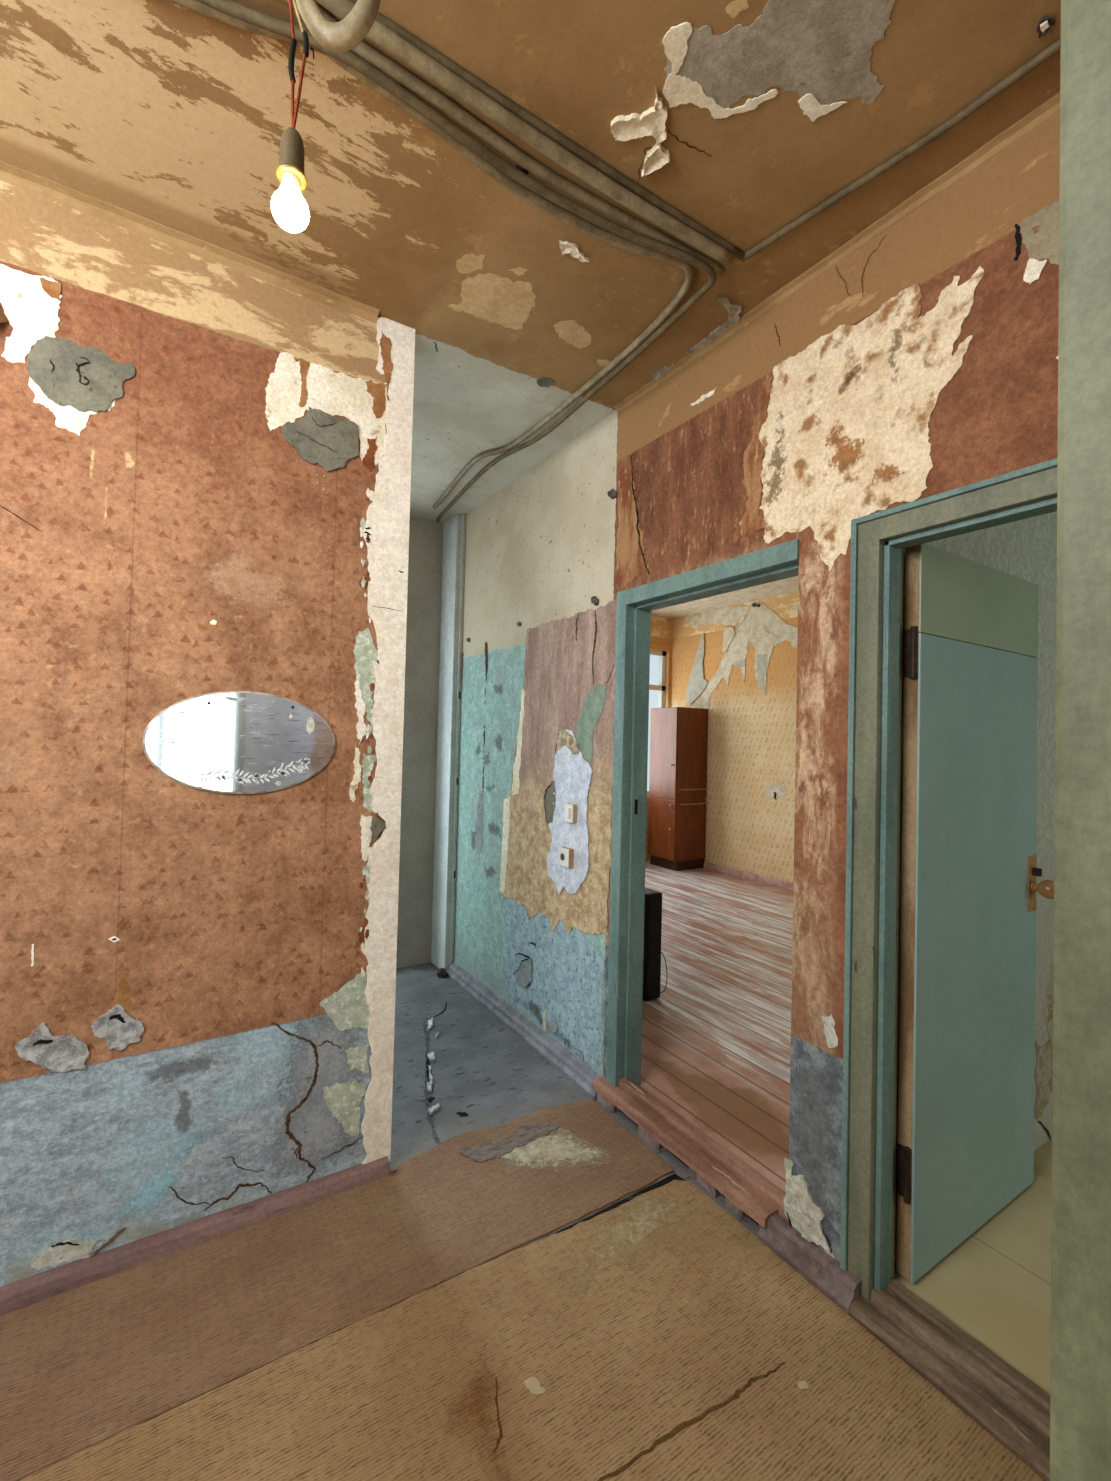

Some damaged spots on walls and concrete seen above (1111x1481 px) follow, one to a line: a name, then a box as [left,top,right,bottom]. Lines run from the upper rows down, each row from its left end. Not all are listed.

peeling [611,0,895,177]
spalling [28,377,115,436]
peeling [365,332,393,418]
flaking render [759,266,984,571]
flaking render [684,602,798,709]
flaking render [267,618,386,1179]
peeling [471,684,606,1070]
spalling [15,974,144,1073]
crack [166,1023,362,1211]
damp [1034,996,1053,1120]
crack [492,1378,503,1453]
crack [597,1362,786,1481]